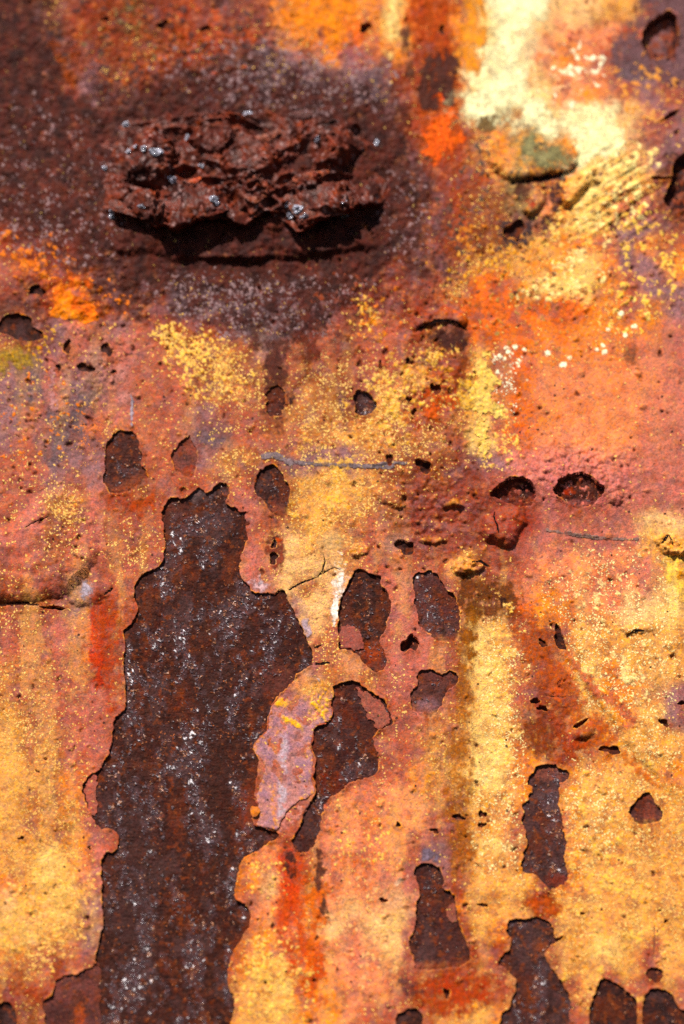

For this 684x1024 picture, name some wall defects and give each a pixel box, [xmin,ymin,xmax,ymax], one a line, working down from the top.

rust [611,0,684,85]
rust [0,0,466,404]
rust [451,173,566,258]
rust [423,323,476,423]
peeling [36,427,474,1024]
rust [440,569,655,877]
peeling [517,761,573,893]
peeling [625,789,666,829]
rust [277,847,329,983]
rust [398,970,514,1018]
rust [524,891,562,919]
peeling [494,913,684,1024]